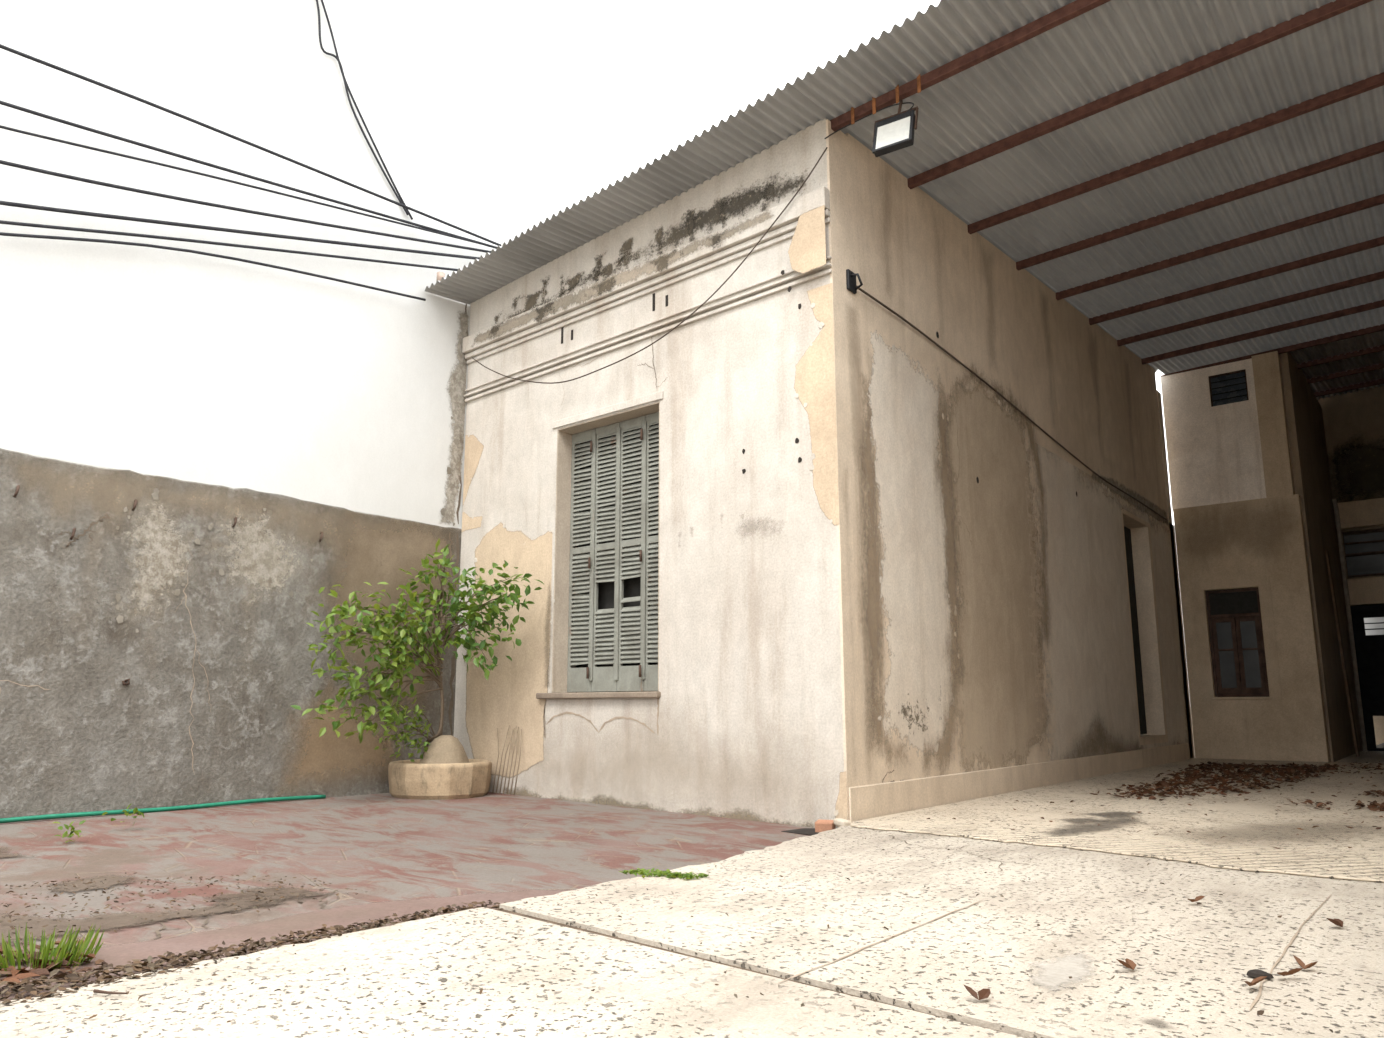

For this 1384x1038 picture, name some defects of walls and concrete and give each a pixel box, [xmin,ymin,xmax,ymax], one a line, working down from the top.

leakage [474,175,805,342]
peeling [781,205,839,526]
peeling [440,312,555,778]
leakage [862,391,963,767]
leakage [1073,722,1135,757]